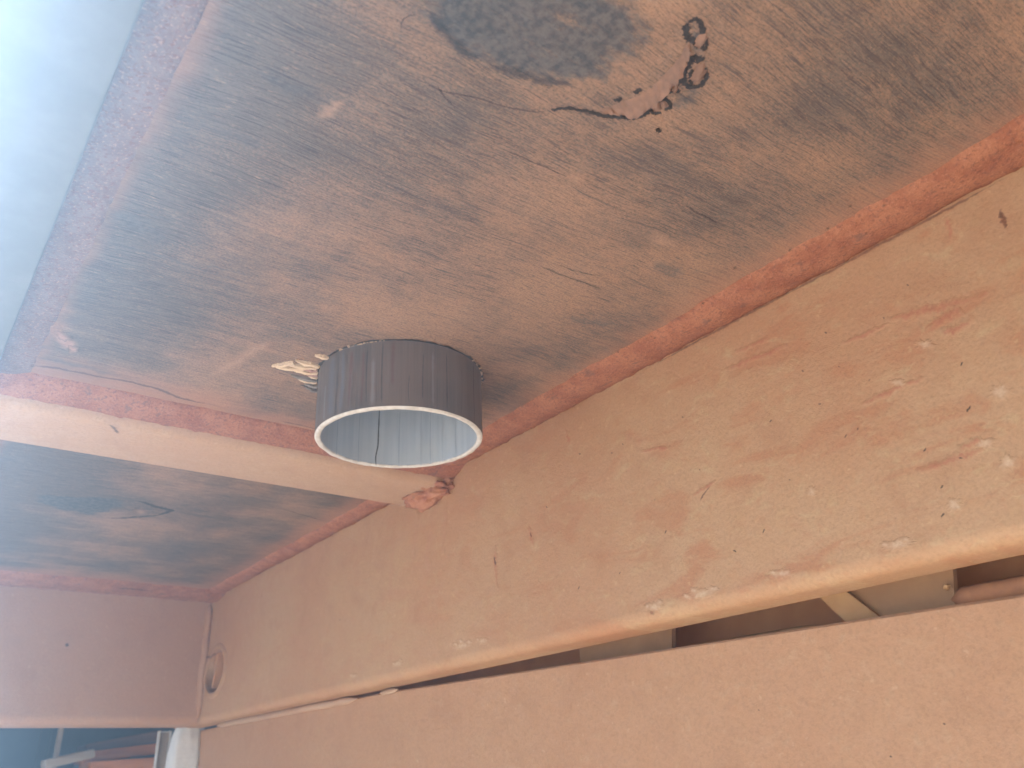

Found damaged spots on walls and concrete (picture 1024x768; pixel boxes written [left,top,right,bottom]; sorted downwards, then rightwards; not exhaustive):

leakage [405,0,664,88]
peeling [693,33,708,49]
peeling [672,63,708,94]
leakage [26,494,129,515]